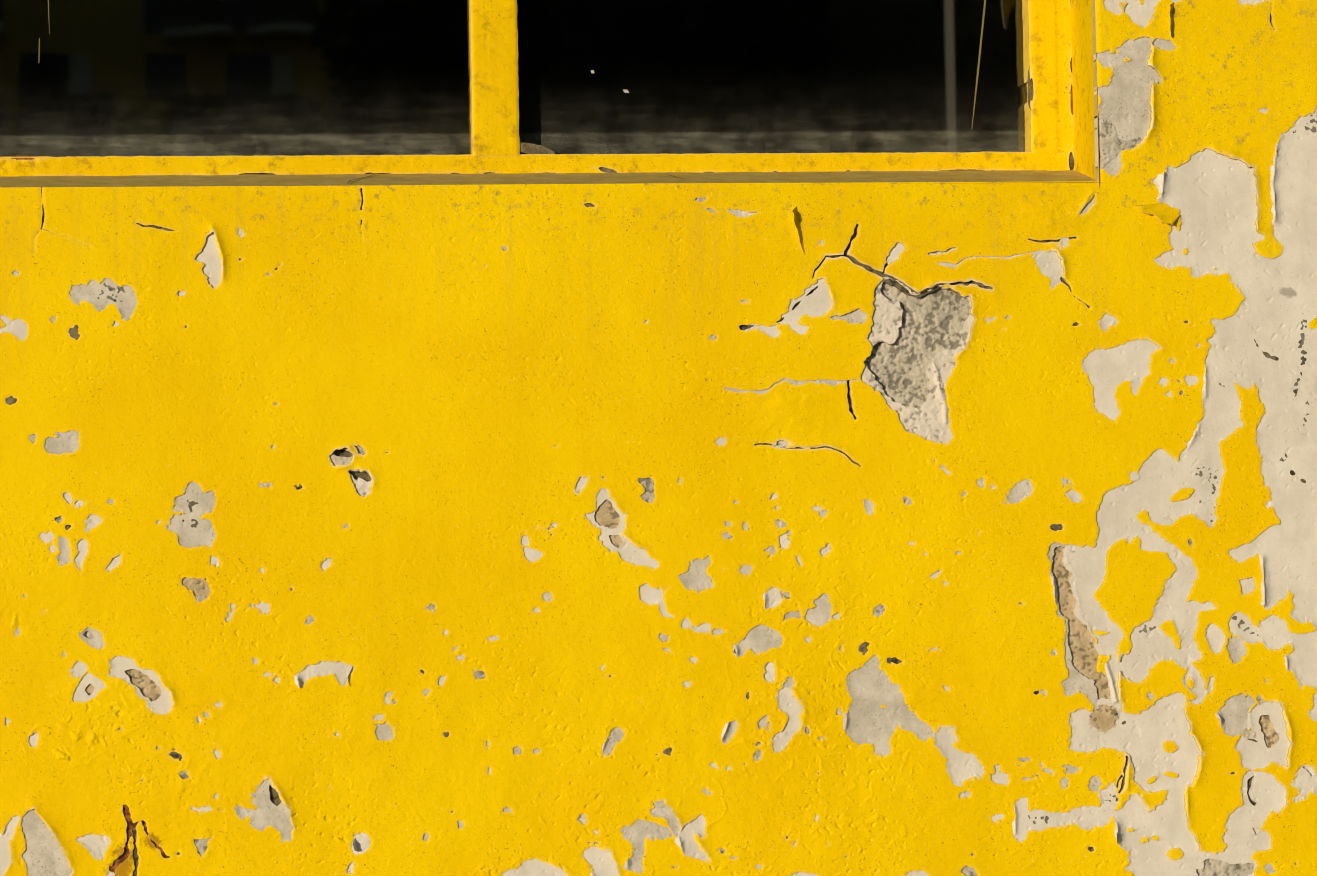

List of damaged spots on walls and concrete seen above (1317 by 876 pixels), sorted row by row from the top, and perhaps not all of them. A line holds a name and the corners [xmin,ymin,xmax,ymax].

peeling [1093,0,1181,176]
peeling [68,278,138,327]
spalling [739,242,1010,444]
crack [812,224,1076,298]
crack [724,378,861,420]
peeling [157,481,219,602]
spalling [573,477,659,569]
crack [754,440,861,467]
peeling [836,107,1317,876]
peeling [733,587,839,762]
peeling [0,809,72,876]
peeling [577,800,737,876]